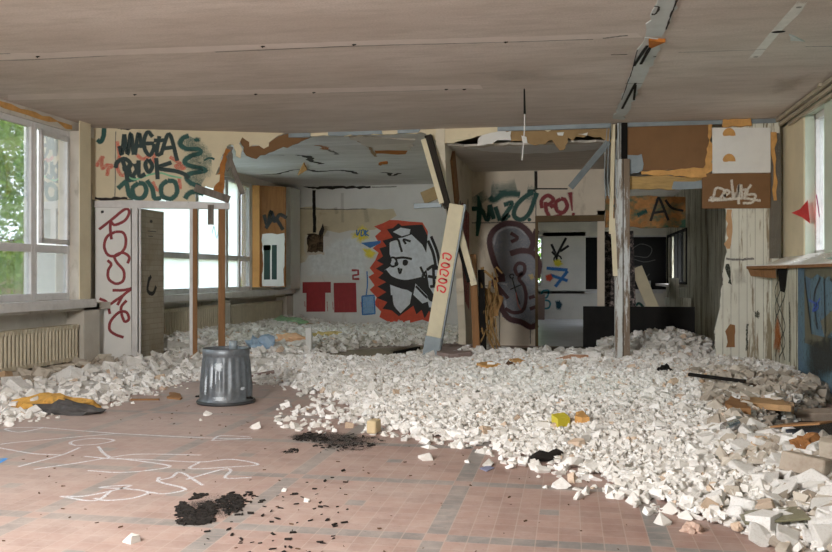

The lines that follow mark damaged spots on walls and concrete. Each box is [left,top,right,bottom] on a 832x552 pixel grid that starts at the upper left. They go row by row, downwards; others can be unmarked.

peeling [613,0,679,120]
peeling [349,136,415,166]
peeling [467,131,603,154]
peeling [724,210,754,284]
peeling [725,324,735,347]